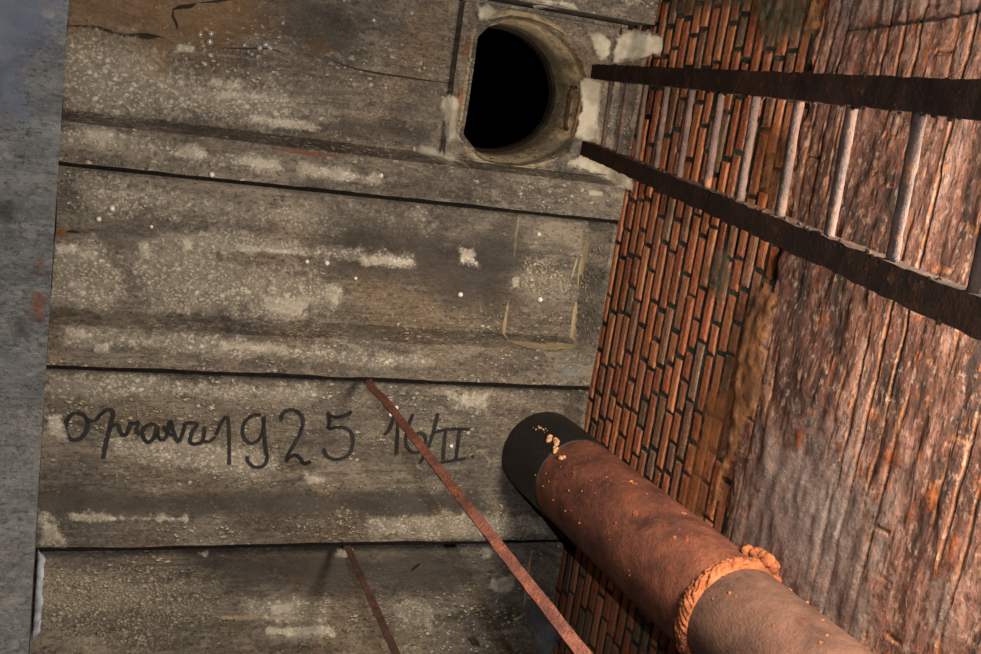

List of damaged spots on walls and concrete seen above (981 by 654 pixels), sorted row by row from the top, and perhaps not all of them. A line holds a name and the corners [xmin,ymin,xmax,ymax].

crack [68,0,229,40]
water stain [803,0,820,34]
water stain [683,277,885,641]
crack [908,422,925,515]
crack [932,415,960,581]
crack [964,495,981,572]